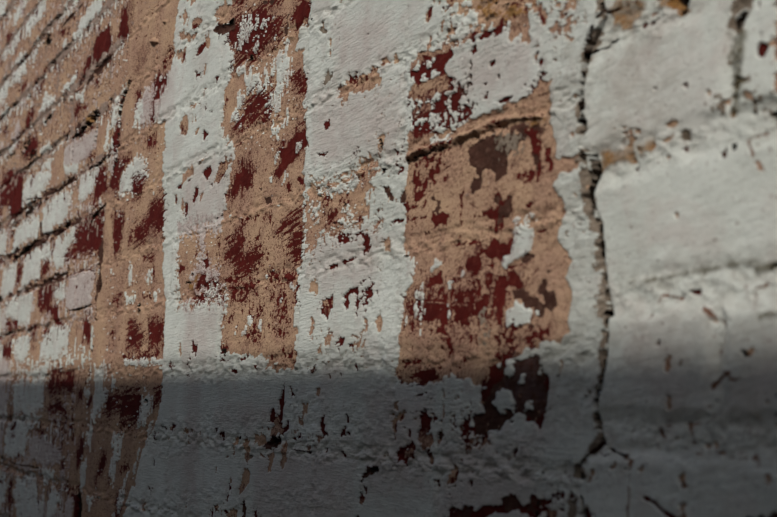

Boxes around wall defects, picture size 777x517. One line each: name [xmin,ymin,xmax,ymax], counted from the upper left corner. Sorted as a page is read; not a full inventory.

spalling [727,0,760,34]
peeling [758,21,777,61]
peeling [615,125,642,173]
peeling [651,119,692,153]
peeling [0,0,595,517]
crack [572,0,638,517]